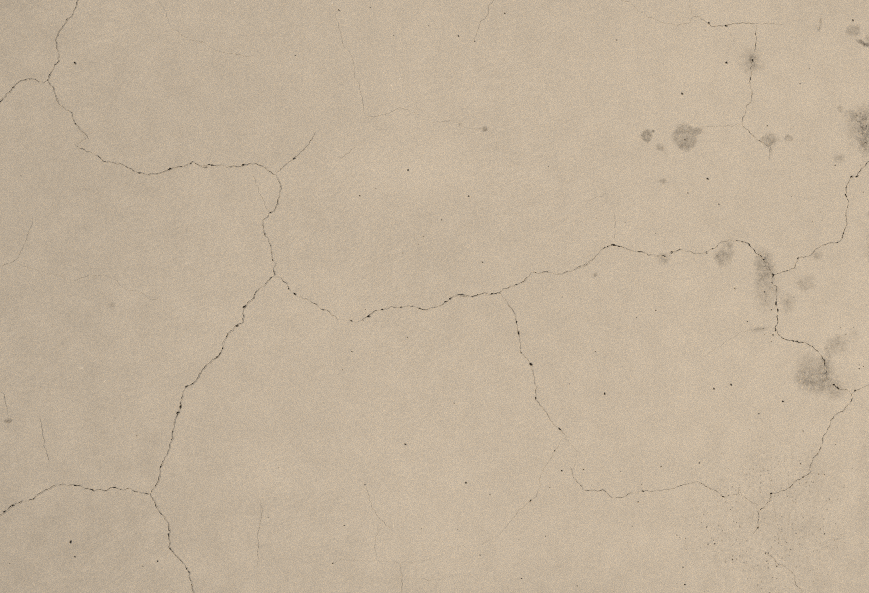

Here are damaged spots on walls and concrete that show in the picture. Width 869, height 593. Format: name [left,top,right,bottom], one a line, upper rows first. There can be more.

crack [0,0,88,140]
crack [622,0,783,157]
crack [0,131,869,593]